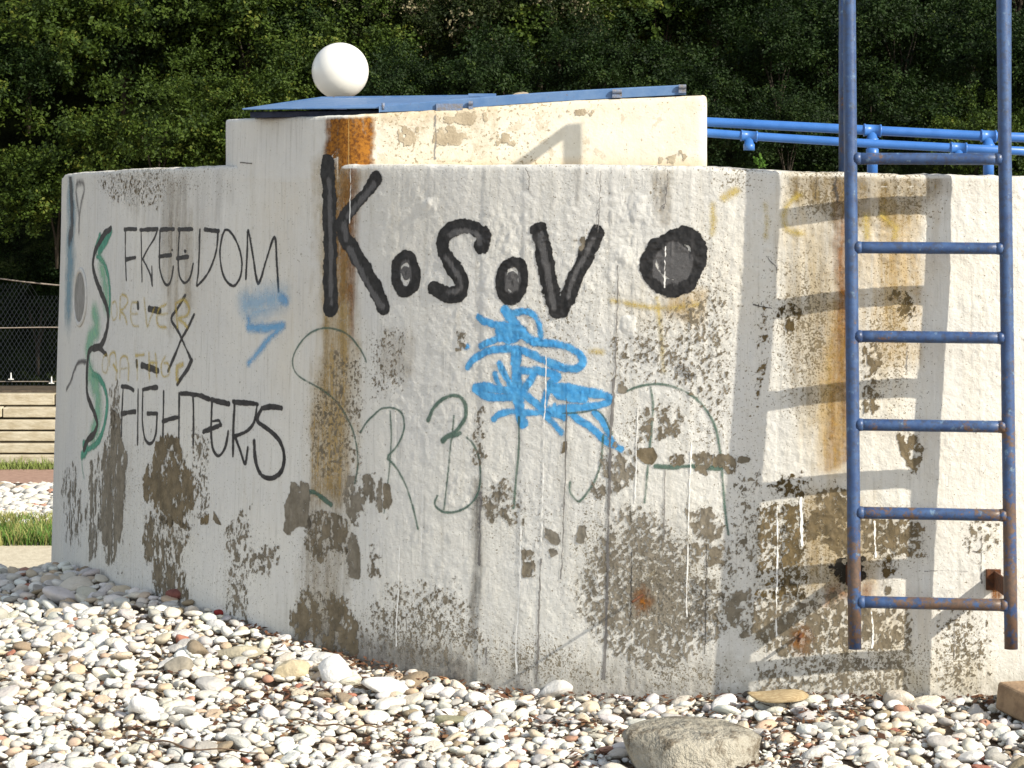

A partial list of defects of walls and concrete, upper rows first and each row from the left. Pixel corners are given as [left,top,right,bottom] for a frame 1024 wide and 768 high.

corrosion [325,117,374,219]
corrosion [311,232,351,497]
leakage [347,545,464,687]